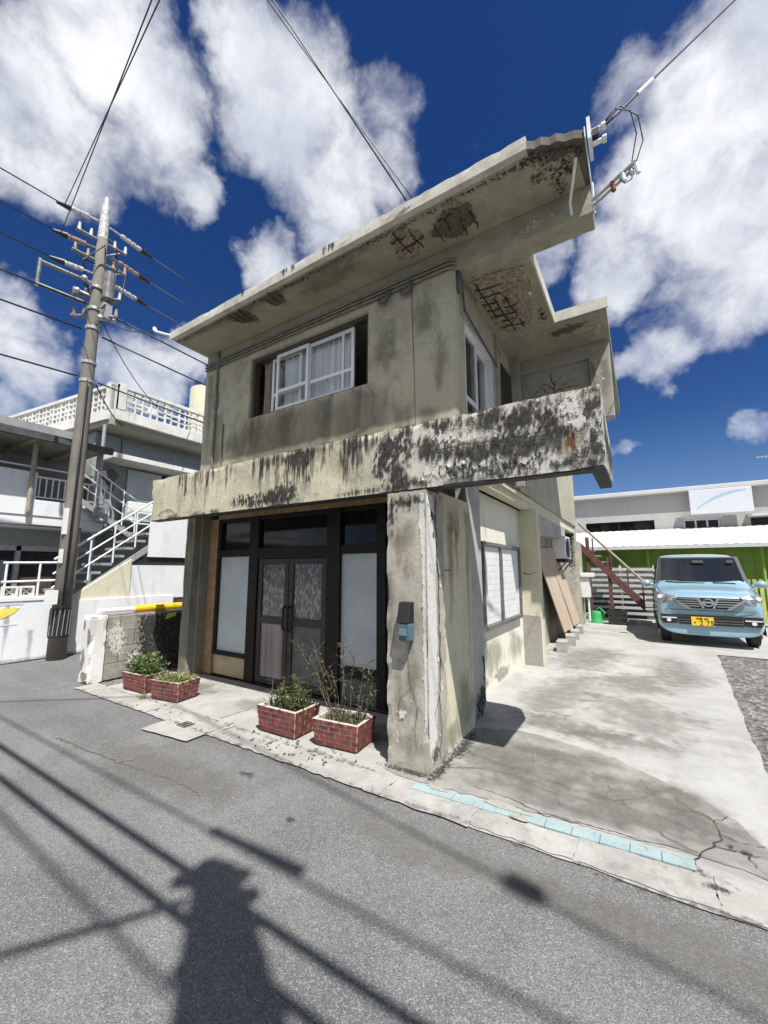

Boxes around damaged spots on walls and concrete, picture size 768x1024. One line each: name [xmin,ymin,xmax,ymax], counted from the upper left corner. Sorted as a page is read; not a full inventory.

damp [531,153,573,196]
spalling [390,202,478,260]
spalling [470,263,587,340]
crack [529,373,579,399]
damp [231,385,613,534]
corrosion [564,429,576,453]
crack [396,497,767,866]